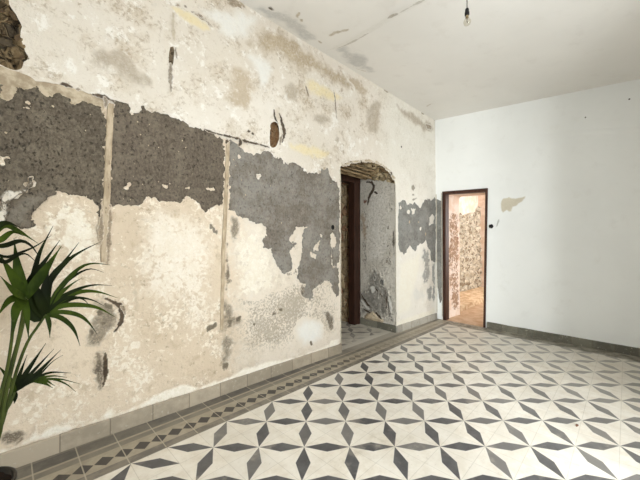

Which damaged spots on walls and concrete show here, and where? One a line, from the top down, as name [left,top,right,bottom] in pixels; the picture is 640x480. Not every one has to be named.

peeling [0,0,104,111]
leakage [333,45,377,73]
peeling [0,177,100,266]
spalling [500,196,526,213]
peeling [229,215,340,361]